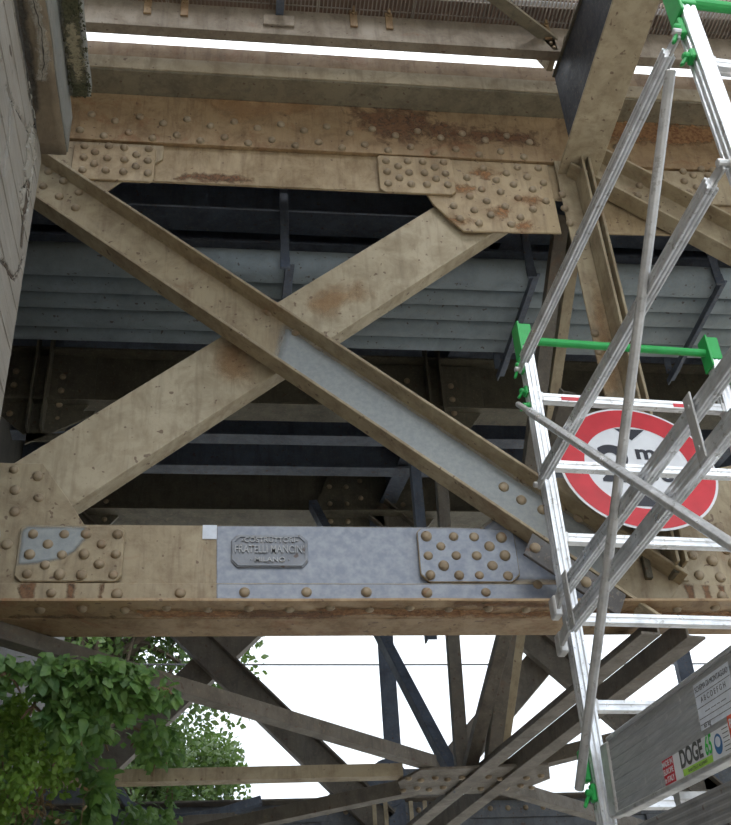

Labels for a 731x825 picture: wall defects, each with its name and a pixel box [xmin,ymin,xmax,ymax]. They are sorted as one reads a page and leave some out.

crack [17,0,51,81]
corrosion [345,105,535,146]
corrosion [174,172,250,182]